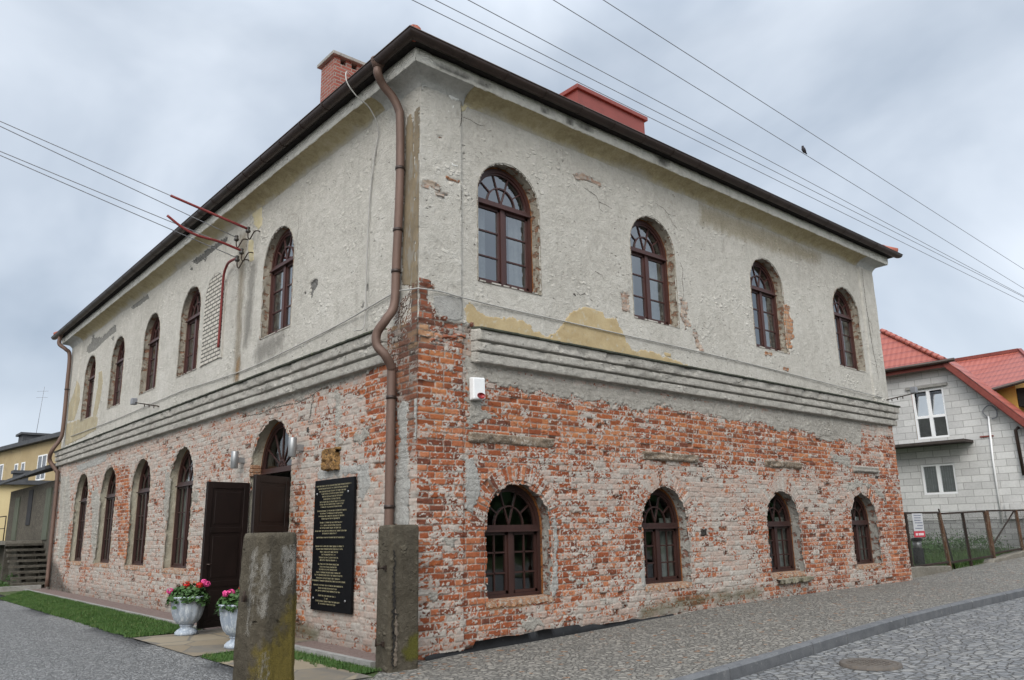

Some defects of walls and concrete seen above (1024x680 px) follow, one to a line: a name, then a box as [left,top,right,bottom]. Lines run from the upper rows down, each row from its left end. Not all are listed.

peeling [388,107,887,504]
peeling [65,371,103,446]
spalling [239,367,384,447]
spalling [57,453,131,574]
spalling [293,481,309,625]
peeling [317,462,371,500]
peeling [520,616,545,632]